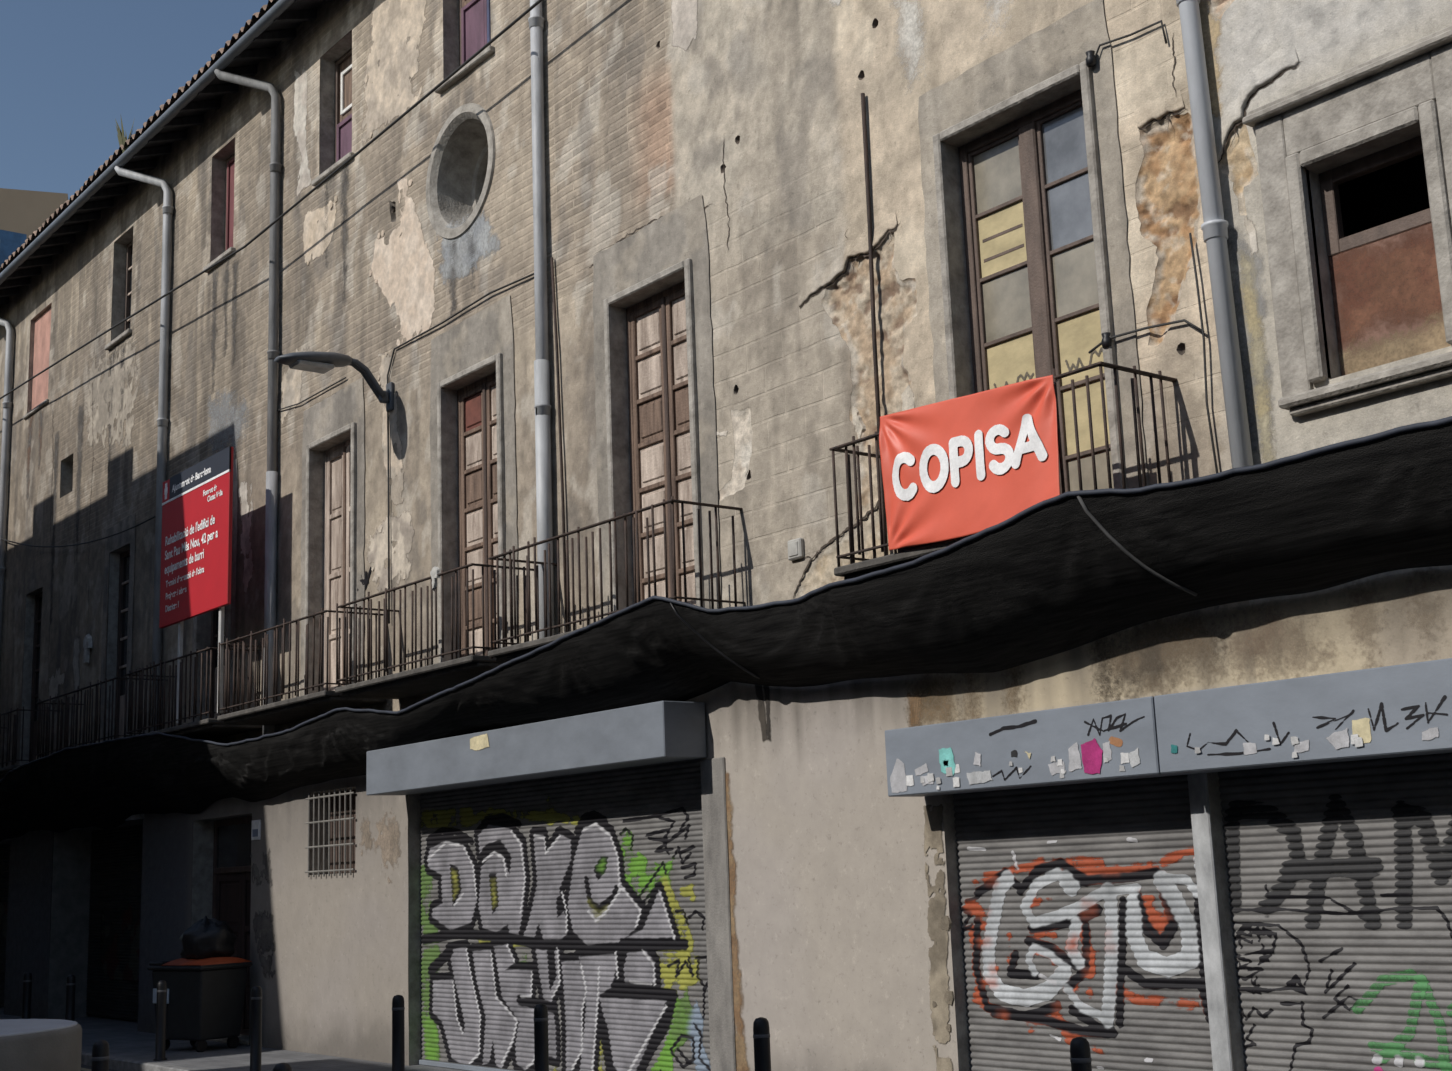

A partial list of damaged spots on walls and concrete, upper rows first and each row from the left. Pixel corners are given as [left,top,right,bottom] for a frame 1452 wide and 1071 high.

flaking render [1207,0,1234,19]
peeling [293,65,311,196]
crack [1134,37,1185,130]
crack [1215,43,1302,163]
peeling [302,195,338,265]
leakage [450,230,475,311]
crack [588,142,730,269]
spalling [1136,113,1201,355]
peeling [367,177,435,592]
spalling [798,232,918,597]